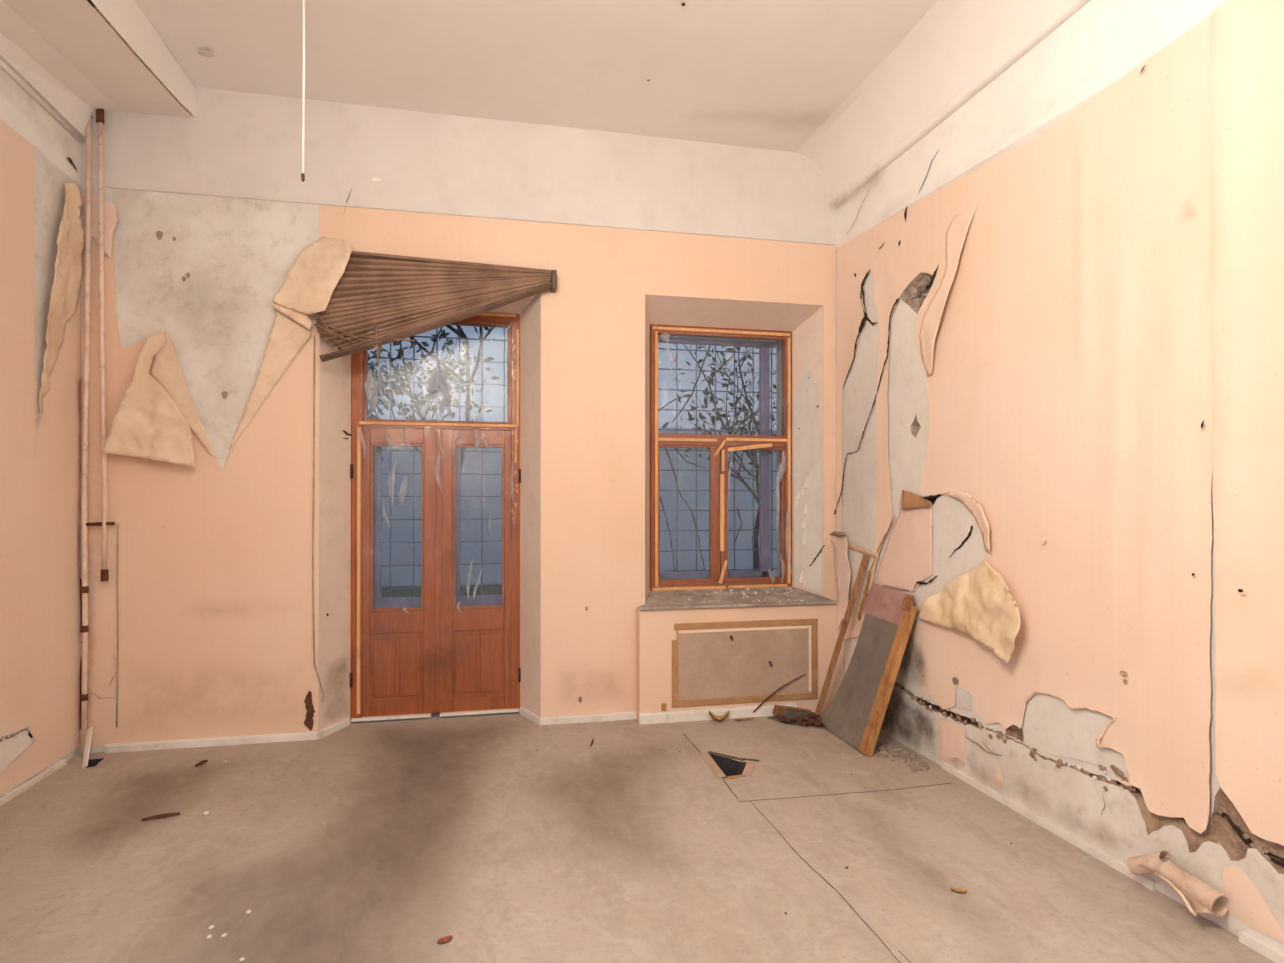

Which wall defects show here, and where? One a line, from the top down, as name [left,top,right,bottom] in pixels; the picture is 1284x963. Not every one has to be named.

peeling [34,145,81,453]
peeling [112,189,320,470]
peeling [842,263,985,624]
crack [0,724,30,743]
peeling [0,728,32,772]
spalling [699,751,755,780]
crack [894,681,1138,792]
peeling [880,677,1284,953]